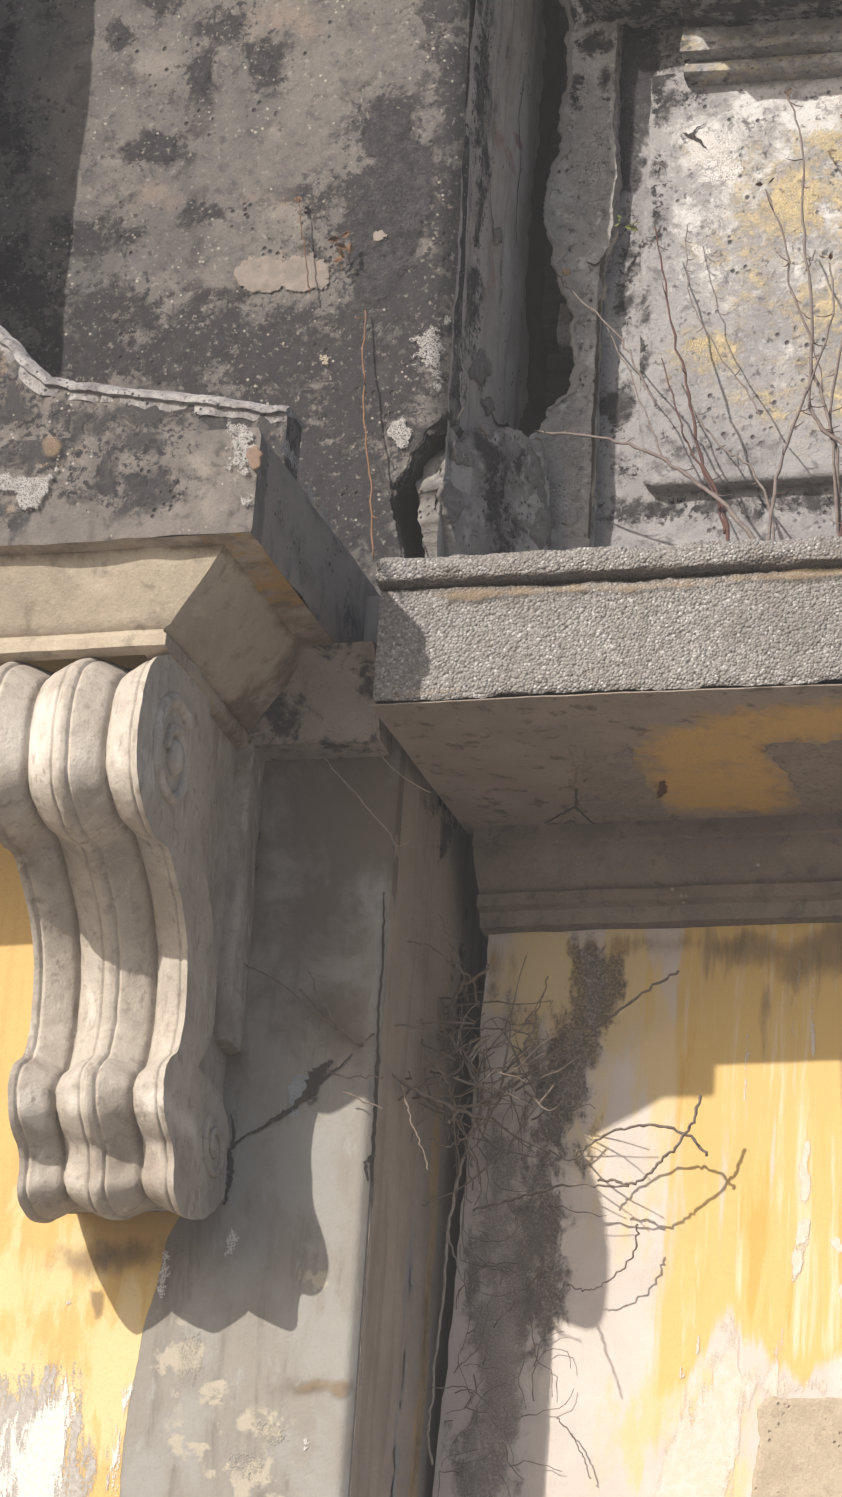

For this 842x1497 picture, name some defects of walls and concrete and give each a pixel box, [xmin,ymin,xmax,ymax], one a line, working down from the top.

water stain [346,98,435,301]
spalling [415,348,554,558]
crack [376,0,621,558]
peeling [0,1350,134,1497]
crack [222,892,385,1386]
water stain [450,936,627,1497]